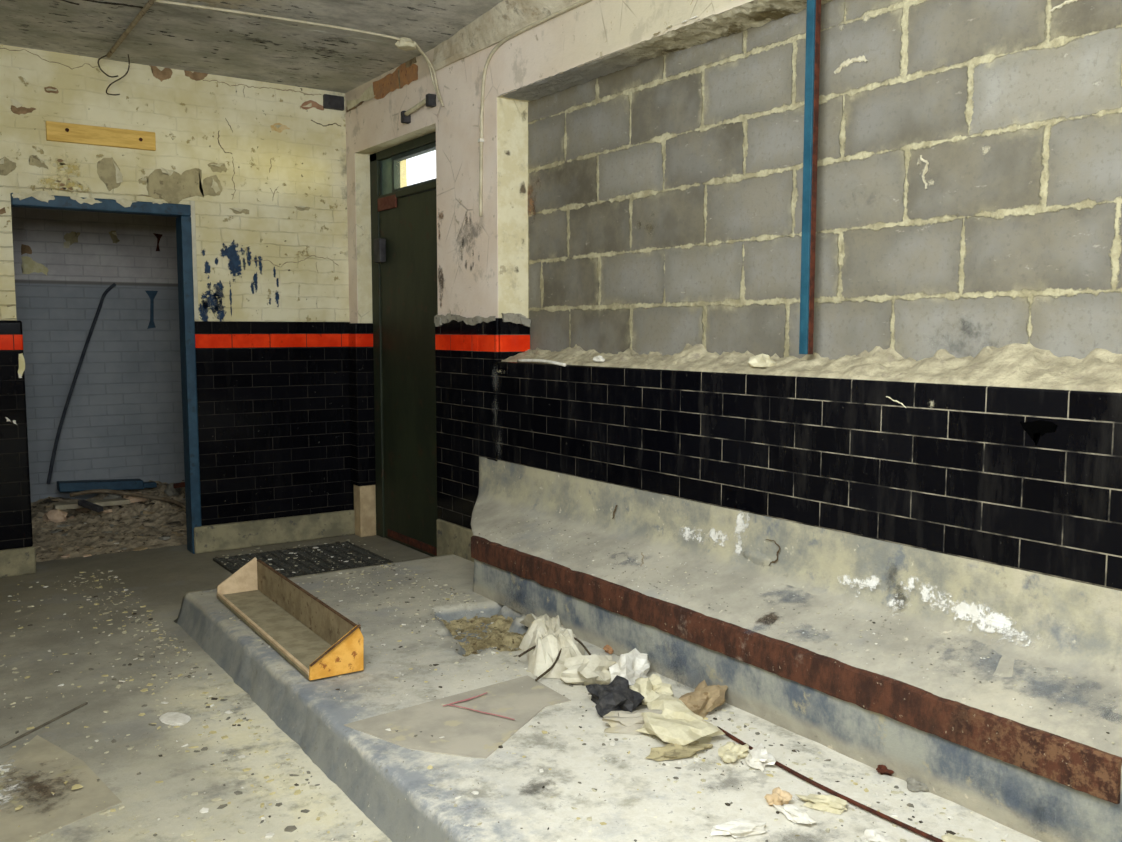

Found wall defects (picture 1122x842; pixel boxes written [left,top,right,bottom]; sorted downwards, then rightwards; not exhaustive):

crack [61,0,143,9]
flaking render [346,57,418,112]
spalling [501,0,807,115]
peeling [0,155,228,214]